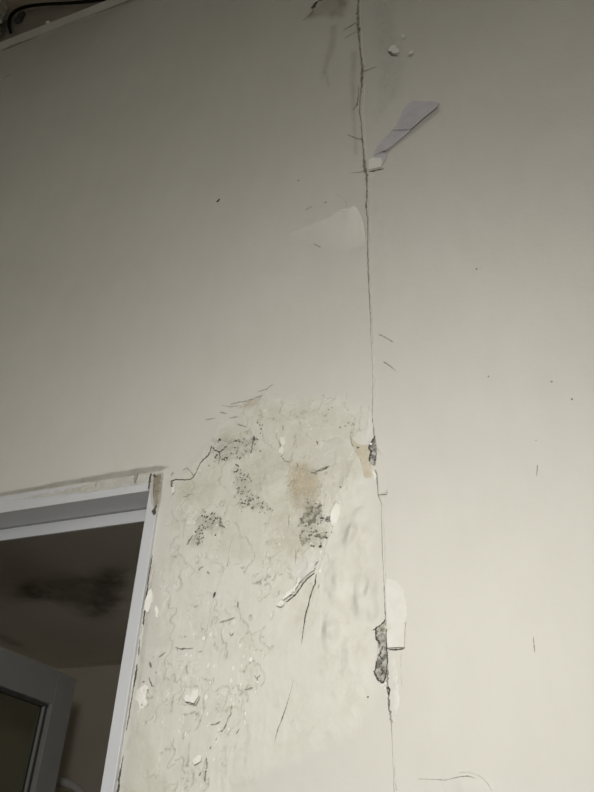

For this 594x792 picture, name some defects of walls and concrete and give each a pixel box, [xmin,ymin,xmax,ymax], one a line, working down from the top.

crack [344,0,376,440]
water stain [199,422,273,514]
spalling [304,406,388,495]
peeling [126,558,165,730]
spalling [175,505,236,652]
spalling [276,498,341,607]
crack [302,577,319,639]
crack [376,476,387,626]
spalling [372,619,391,692]
peeling [180,660,235,782]
crack [386,651,400,791]